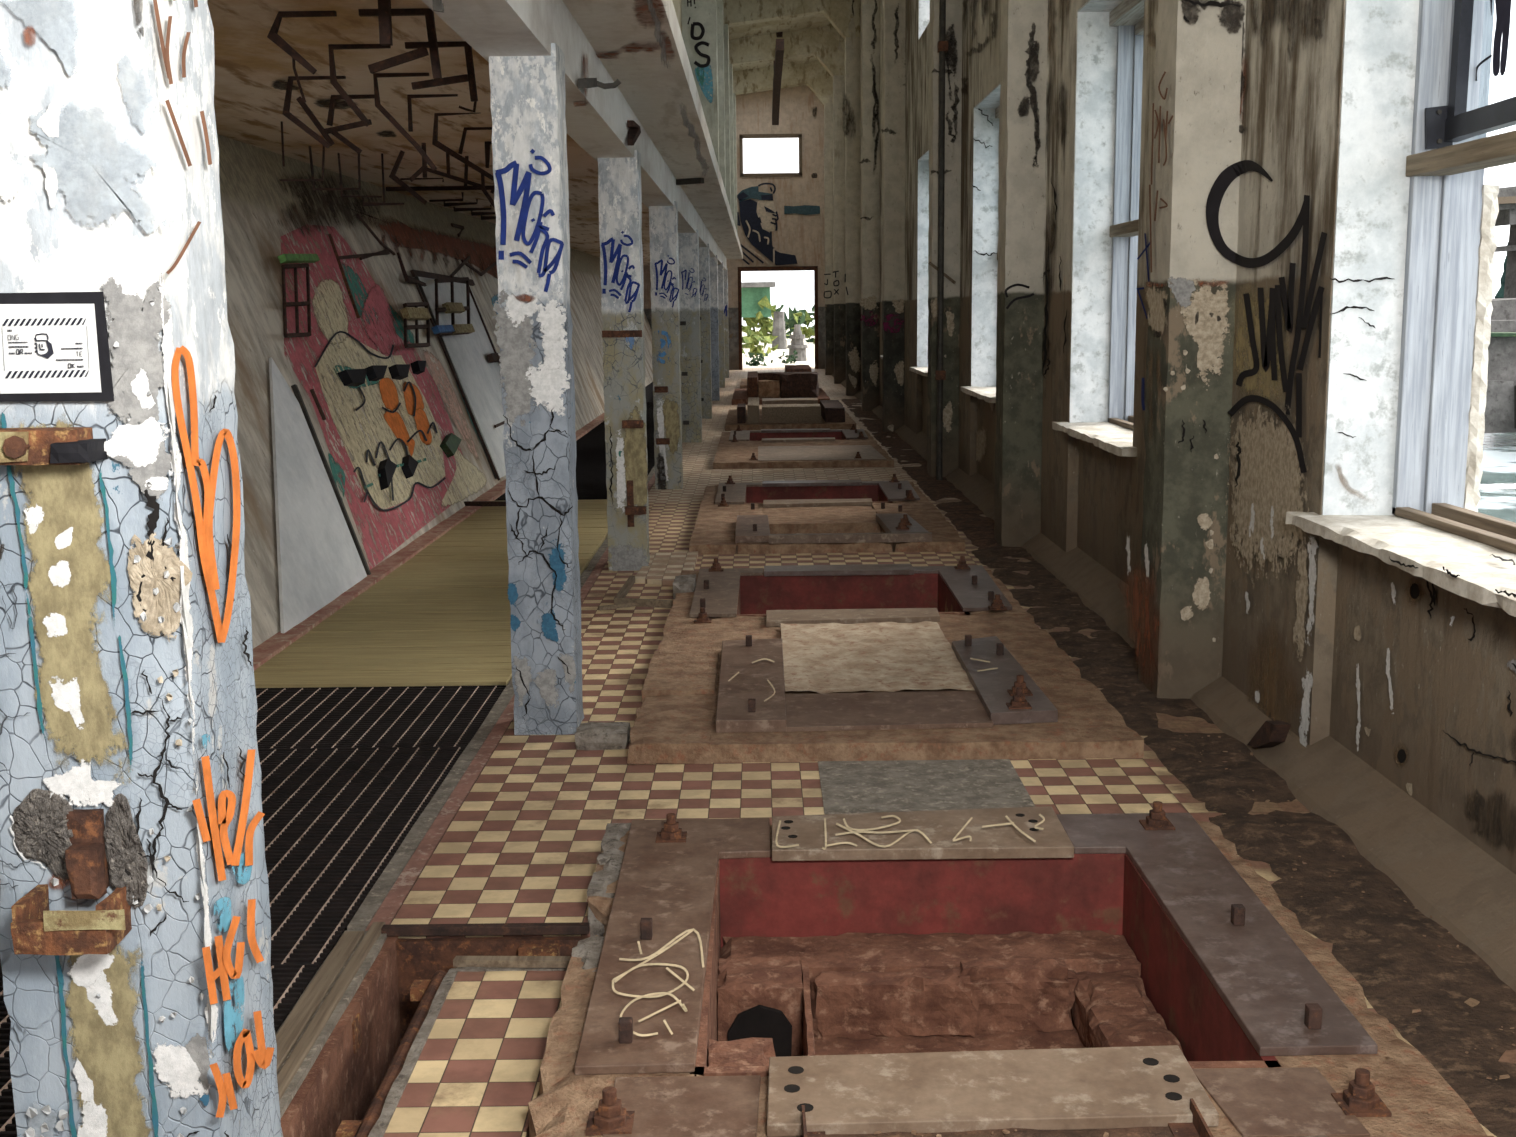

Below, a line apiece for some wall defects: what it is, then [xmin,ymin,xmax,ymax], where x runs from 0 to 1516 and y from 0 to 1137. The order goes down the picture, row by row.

water stain [1018,0,1068,167]
crack [1181,0,1245,33]
water stain [1240,0,1327,97]
peeling [493,289,571,426]
peeling [1144,276,1231,425]
peeling [48,527,73,588]
crack [227,534,252,666]
flaking render [1197,401,1319,747]
crack [1389,554,1516,641]
peeling [47,676,85,729]
crack [130,669,189,937]
rust [50,876,70,888]